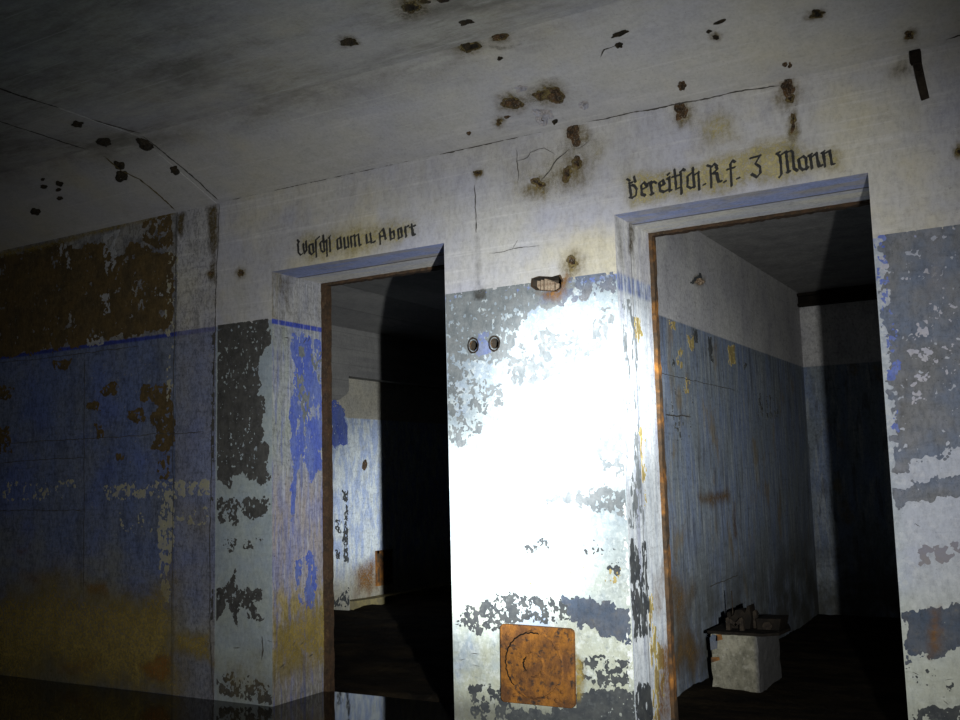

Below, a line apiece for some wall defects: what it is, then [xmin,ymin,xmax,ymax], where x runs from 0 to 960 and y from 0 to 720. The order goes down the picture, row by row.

spalling [458,41,482,53]
crack [440,132,584,182]
spalling [496,85,589,185]
crack [588,86,775,122]
peeling [0,214,271,603]
peeling [289,331,348,522]
peeling [874,224,960,510]
peeling [445,254,665,720]
peeling [918,541,960,566]
peeling [210,568,264,627]
peeling [901,602,960,686]
peeling [912,705,960,720]